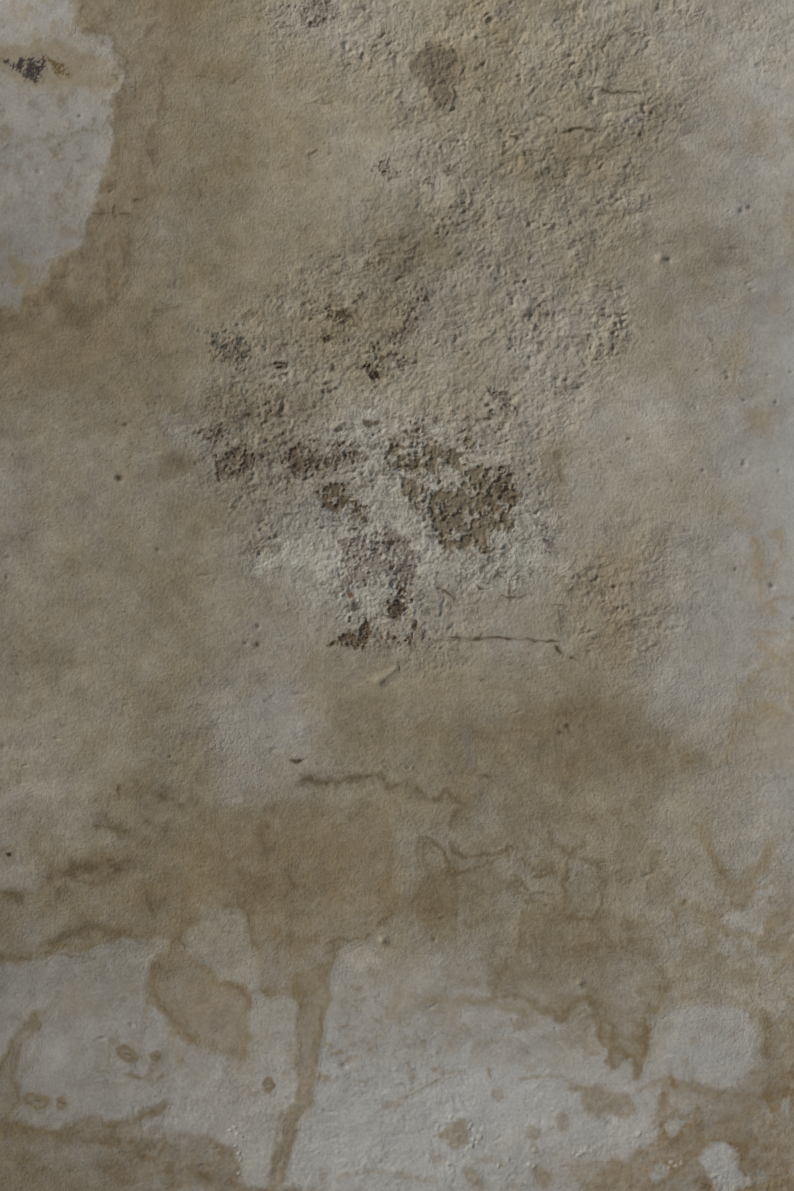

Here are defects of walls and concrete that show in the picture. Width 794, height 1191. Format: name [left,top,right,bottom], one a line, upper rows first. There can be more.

leakage [0,0,232,408]
leakage [261,0,353,41]
spalling [186,225,562,666]
leakage [0,378,794,1191]